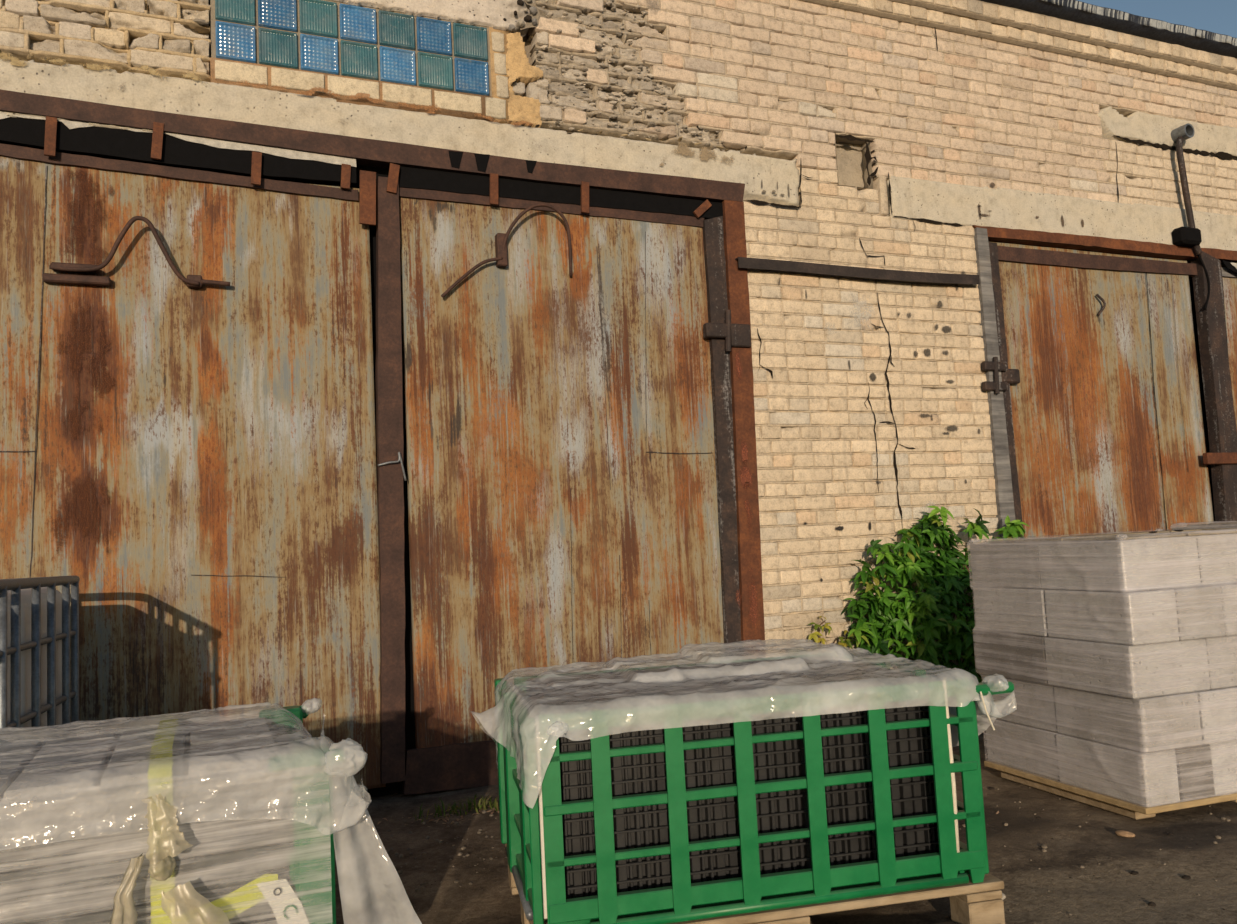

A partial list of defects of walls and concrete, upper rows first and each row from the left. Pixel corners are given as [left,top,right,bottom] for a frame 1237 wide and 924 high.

spalling [503,0,733,163]
crack [864,293,915,529]
rust [47,476,113,552]